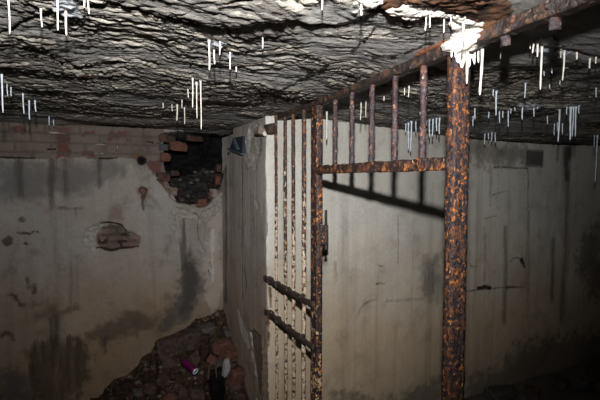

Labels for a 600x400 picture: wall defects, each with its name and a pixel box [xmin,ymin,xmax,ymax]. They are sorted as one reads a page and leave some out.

corrosion [375,0,513,29]
flaking render [0,121,224,235]
flaking render [83,221,140,252]
damp [164,254,200,329]
crack [473,284,513,292]